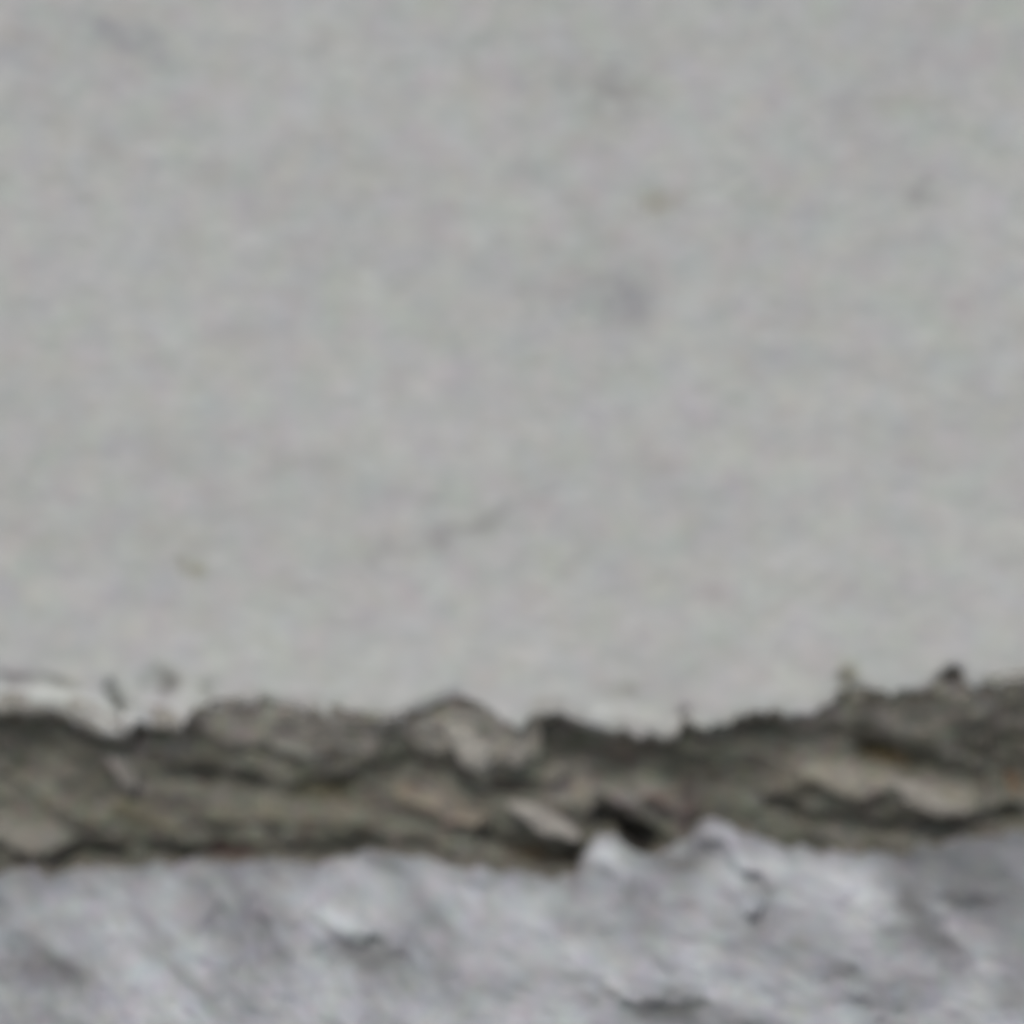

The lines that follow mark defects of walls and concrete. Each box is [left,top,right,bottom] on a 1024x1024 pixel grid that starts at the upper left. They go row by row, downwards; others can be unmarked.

spalling [0,691,53,714]
spalling [68,697,121,738]
spalling [145,695,542,791]
spalling [768,672,1024,754]